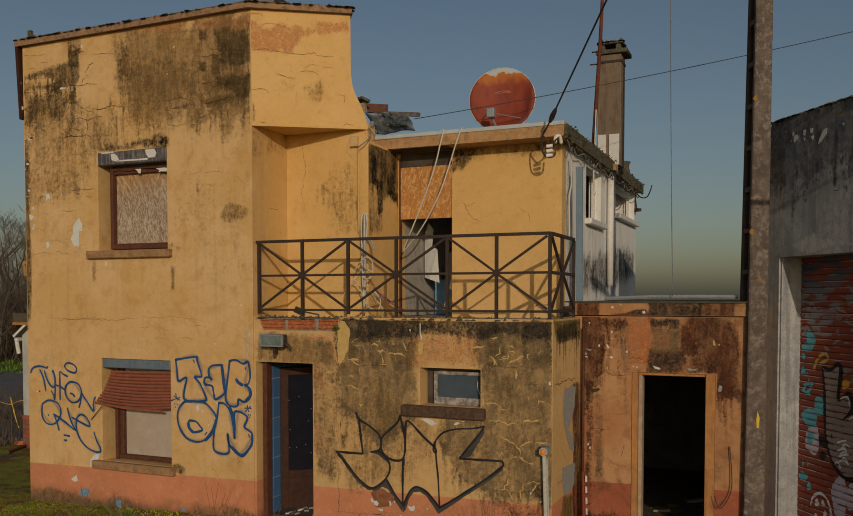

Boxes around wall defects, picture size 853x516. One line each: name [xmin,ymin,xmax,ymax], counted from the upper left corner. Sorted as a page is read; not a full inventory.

peeling [146,15,348,52]
crack [25,13,332,156]
damp [115,14,254,135]
peeling [791,128,827,144]
damp [770,97,853,217]
damp [371,158,398,215]
peeling [71,218,84,248]
flaking render [261,319,350,365]
crack [326,338,408,390]
damp [258,303,741,516]